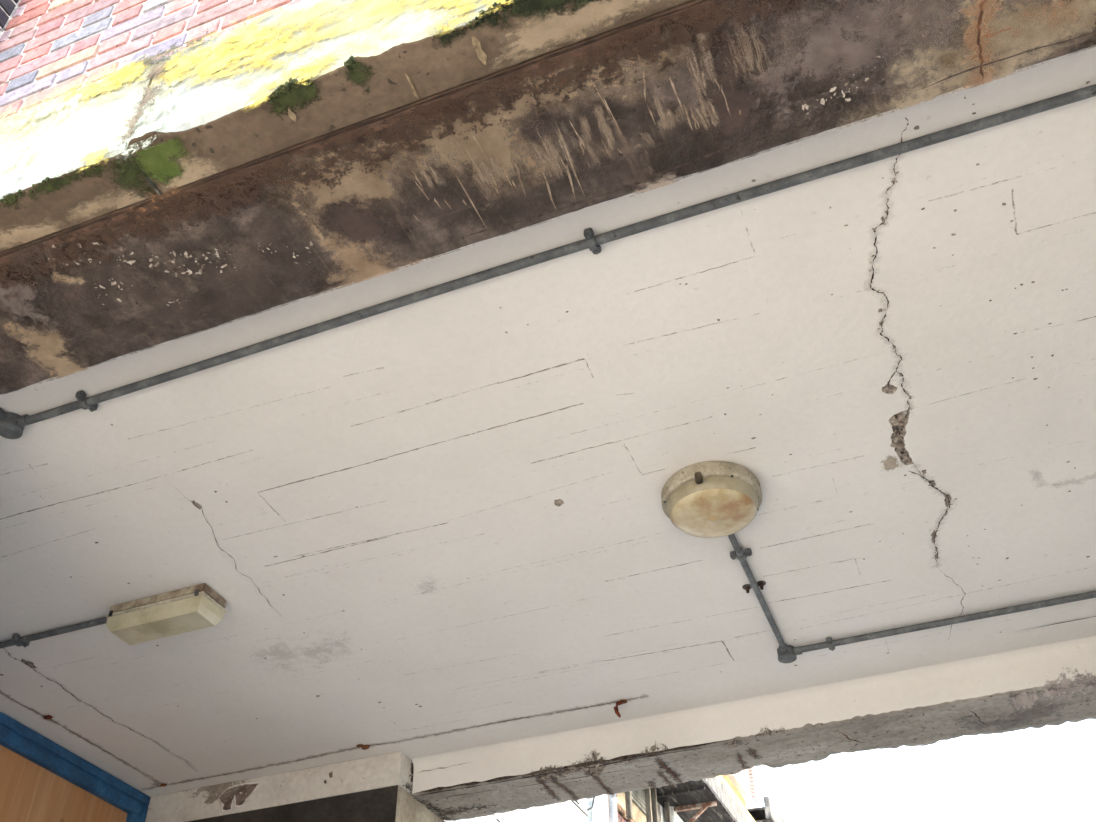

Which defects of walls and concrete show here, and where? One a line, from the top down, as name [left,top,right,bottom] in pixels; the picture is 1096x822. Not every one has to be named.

crack [916,0,1096,91]
corrosion [0,0,864,300]
water stain [0,0,1096,391]
crack [868,117,912,415]
spalling [881,411,914,470]
crack [174,487,276,610]
crack [909,466,966,639]
water stain [1010,669,1096,710]
peeling [218,782,259,812]